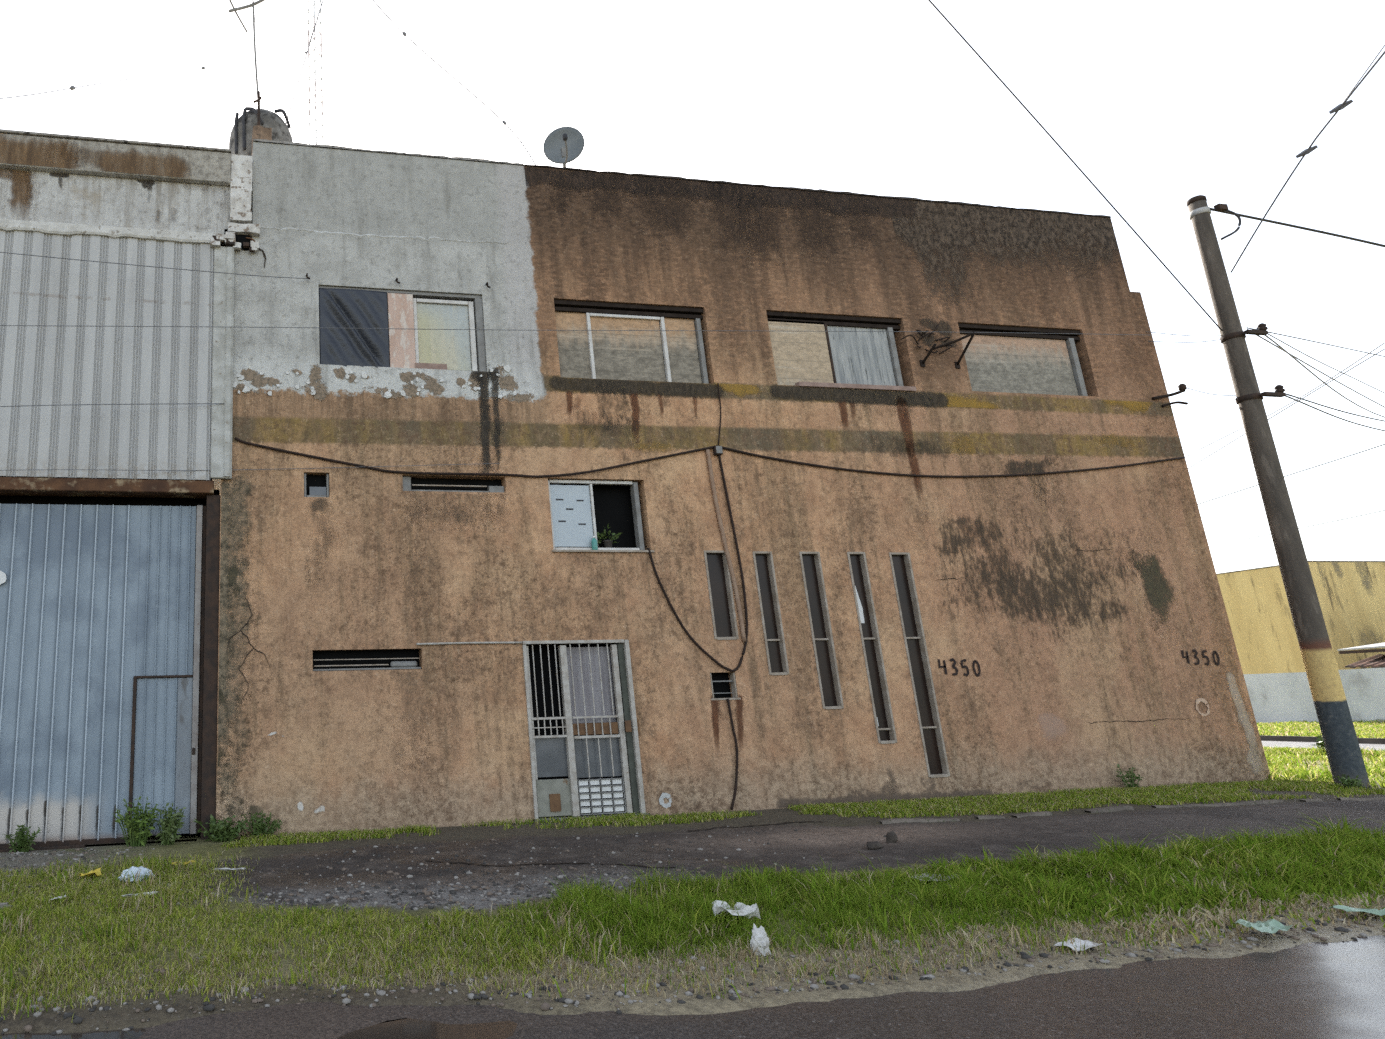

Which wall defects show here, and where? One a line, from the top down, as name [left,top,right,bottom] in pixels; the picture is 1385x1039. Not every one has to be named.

corrosion [0,136,187,207]
water stain [524,166,1118,301]
peeling [233,364,535,402]
water stain [918,318,956,348]
water stain [940,510,1174,641]
crack [226,597,270,703]